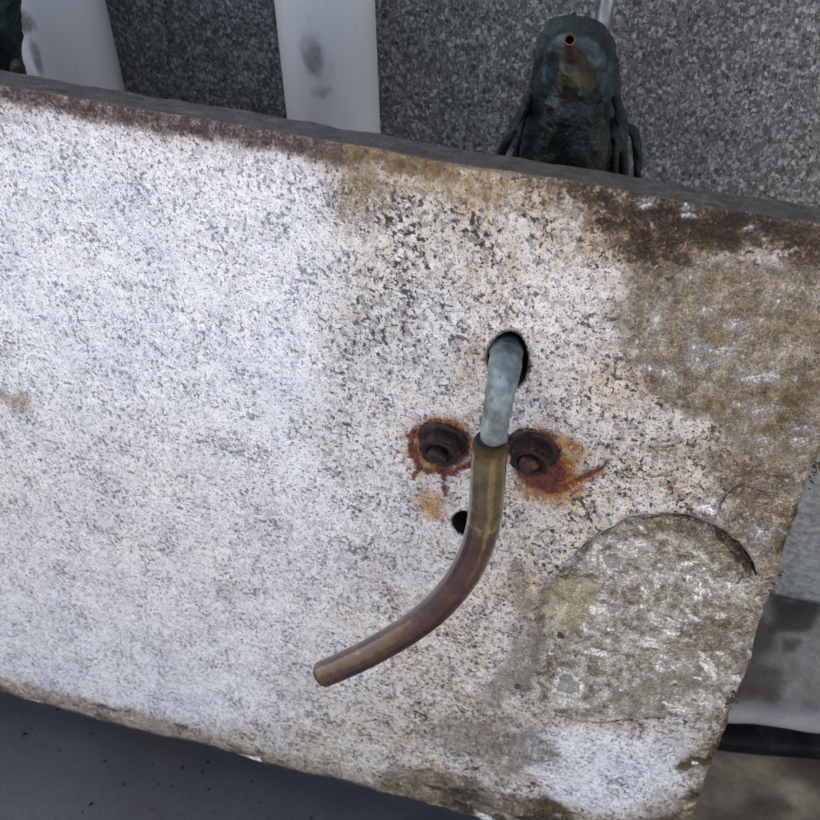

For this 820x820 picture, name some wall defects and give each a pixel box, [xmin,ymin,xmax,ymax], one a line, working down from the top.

rust [400,416,472,521]
rust [514,430,609,505]
spalling [515,497,770,724]